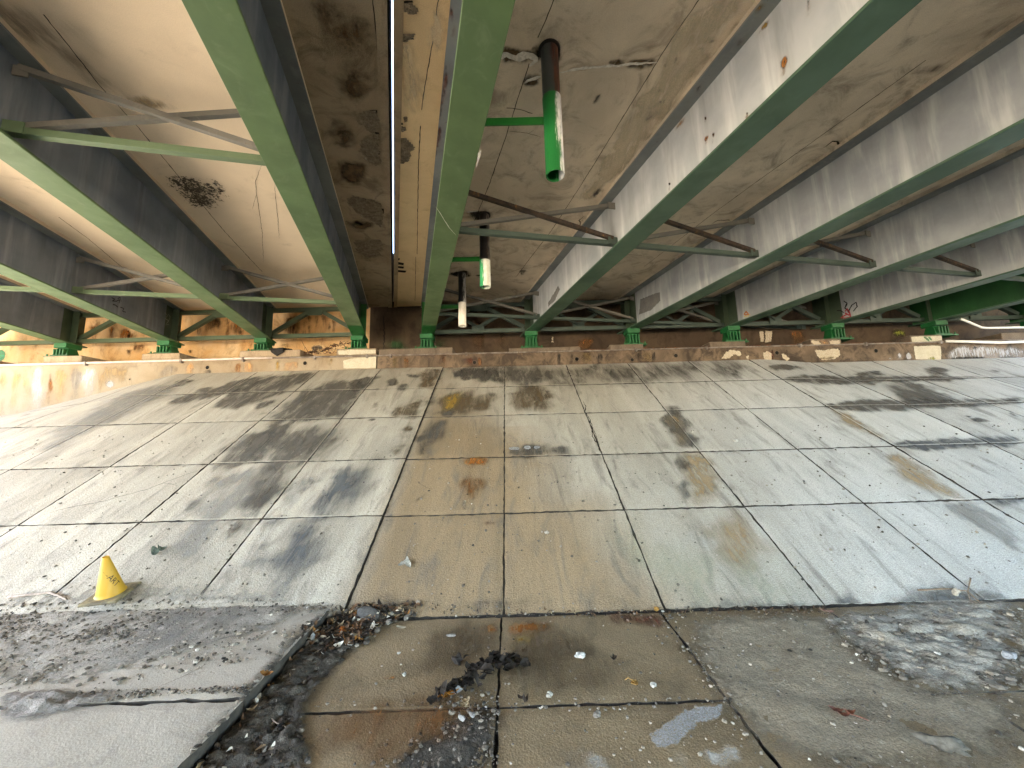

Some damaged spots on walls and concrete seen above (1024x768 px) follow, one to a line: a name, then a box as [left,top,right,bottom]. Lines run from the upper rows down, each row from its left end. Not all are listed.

spalling [356,110,382,166]
crack [253,170,279,246]
spalling [347,195,384,227]
damp [714,364,741,377]
peeling [759,331,789,361]
peeling [792,331,840,360]
damp [44,352,698,553]
damp [662,406,715,496]
damp [262,468,366,580]